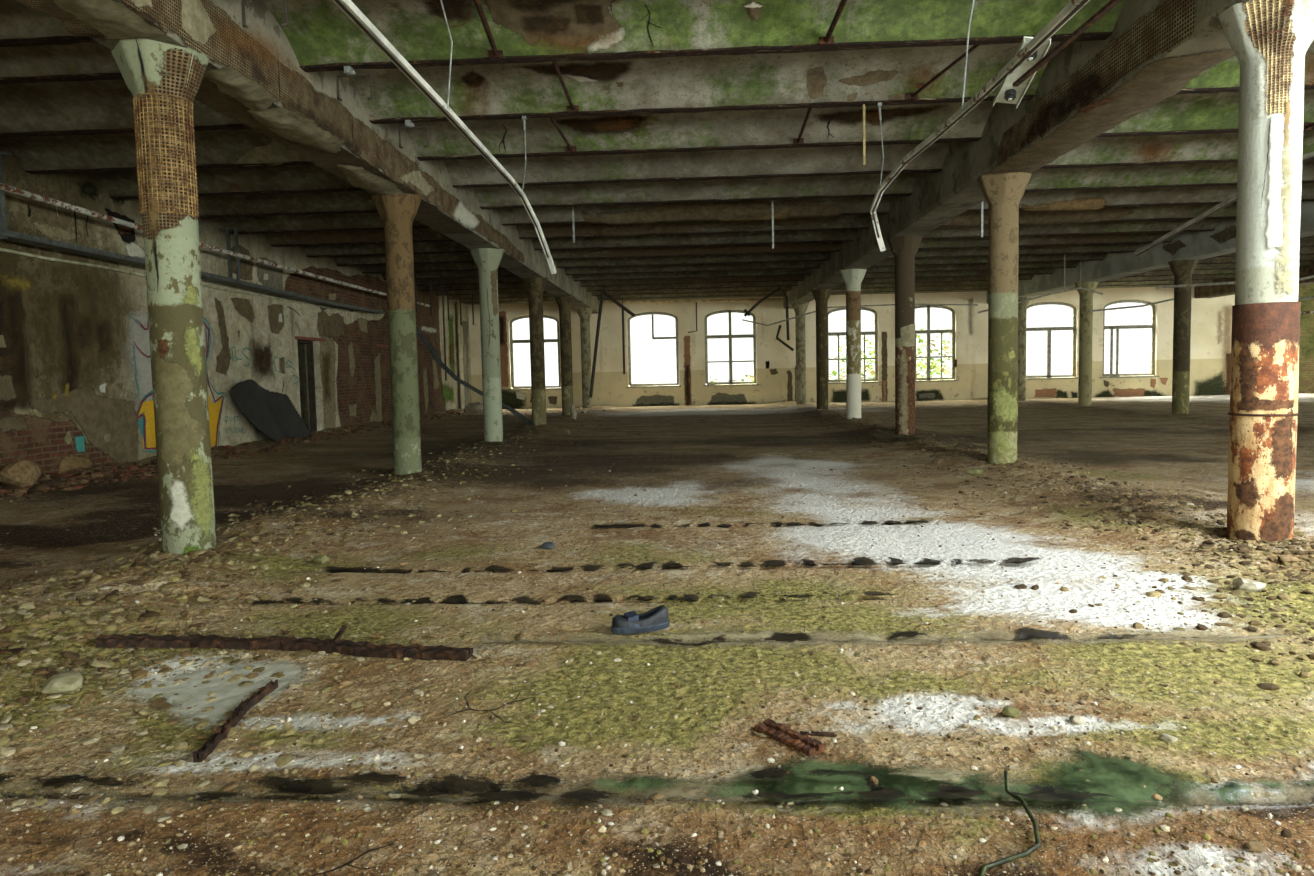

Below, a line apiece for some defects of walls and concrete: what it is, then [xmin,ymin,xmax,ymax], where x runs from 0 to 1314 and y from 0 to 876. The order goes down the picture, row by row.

leakage [425,0,472,21]
spalling [0,383,139,485]
flaking render [154,245,392,554]
corrosion [898,324,915,434]
corrosion [1195,341,1295,542]